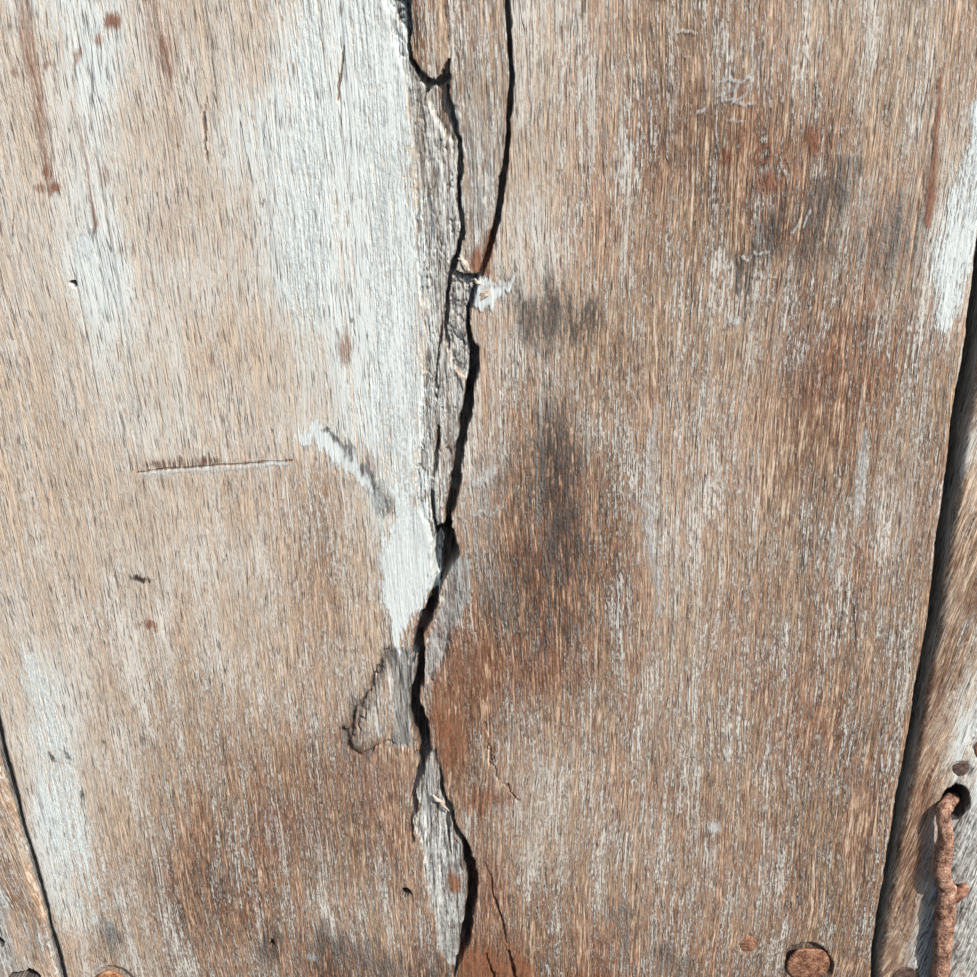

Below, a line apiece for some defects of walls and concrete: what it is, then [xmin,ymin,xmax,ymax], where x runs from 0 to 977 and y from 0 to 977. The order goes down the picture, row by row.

crack [337,44,345,100]
crack [342,0,520,977]